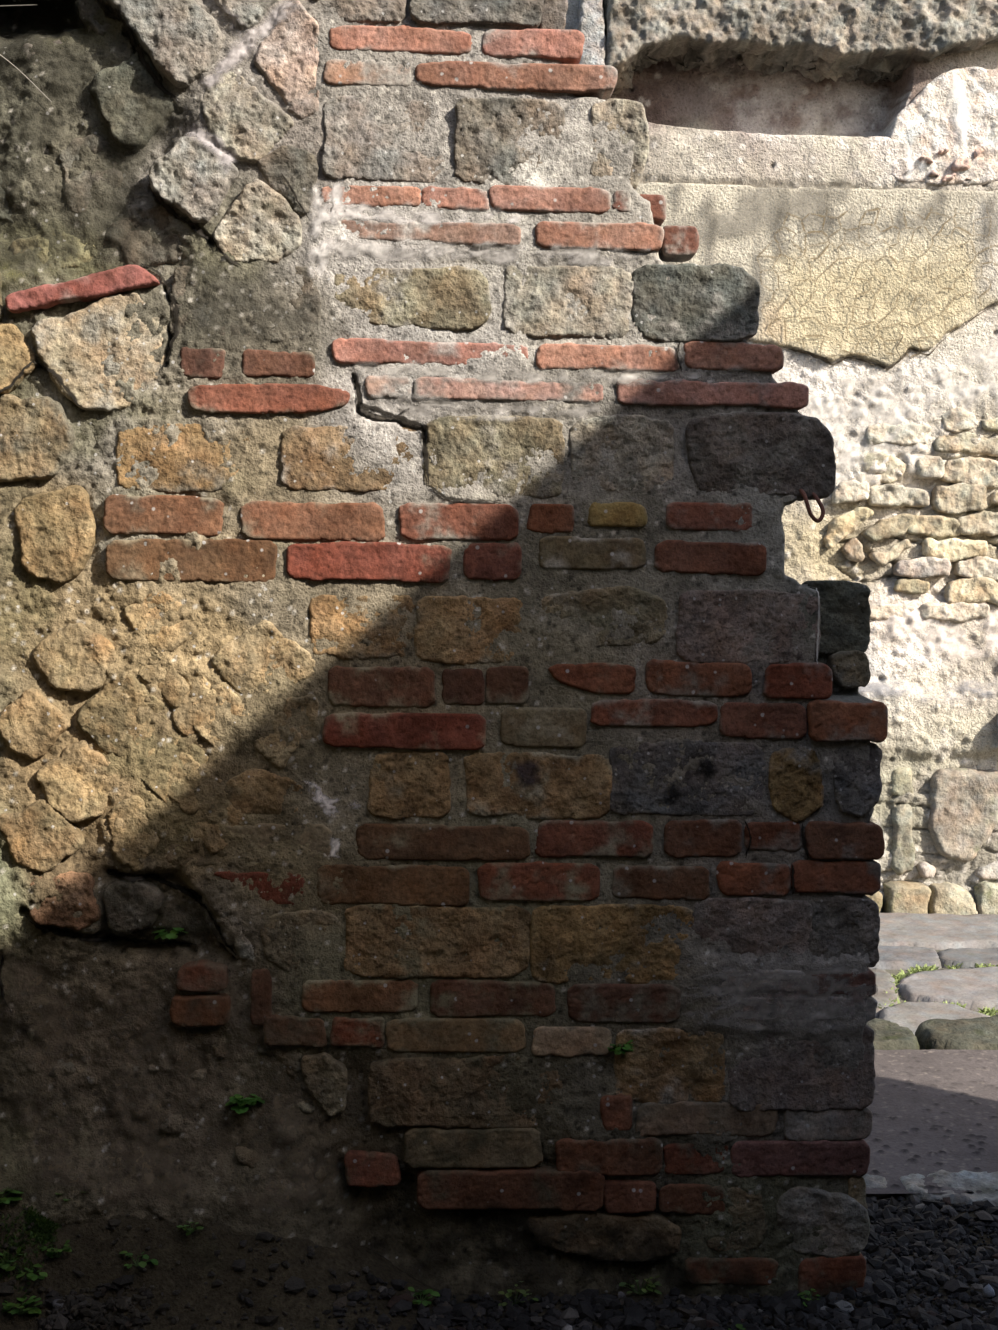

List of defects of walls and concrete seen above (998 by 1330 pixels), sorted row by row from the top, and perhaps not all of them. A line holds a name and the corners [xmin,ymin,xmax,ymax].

crack [758,207,998,370]
crack [353,373,500,502]
peeling [807,348,998,488]
peeling [887,609,998,655]